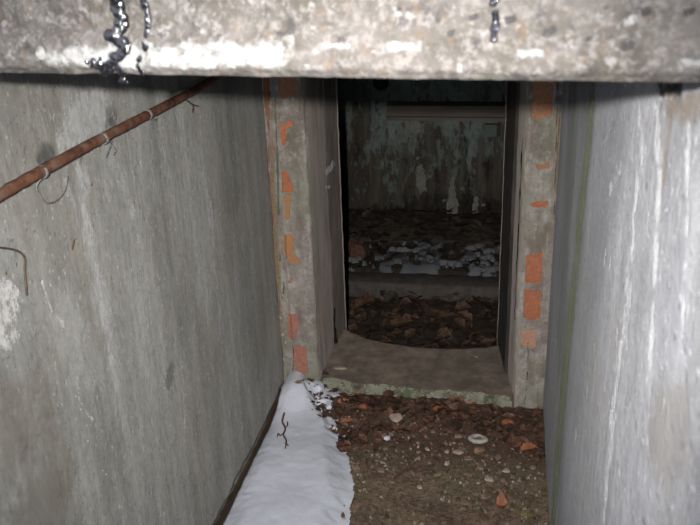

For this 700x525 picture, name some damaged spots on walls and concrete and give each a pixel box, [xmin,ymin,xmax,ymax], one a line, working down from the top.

rust [0,76,227,204]
peeling [416,156,432,193]
peeling [442,176,464,214]